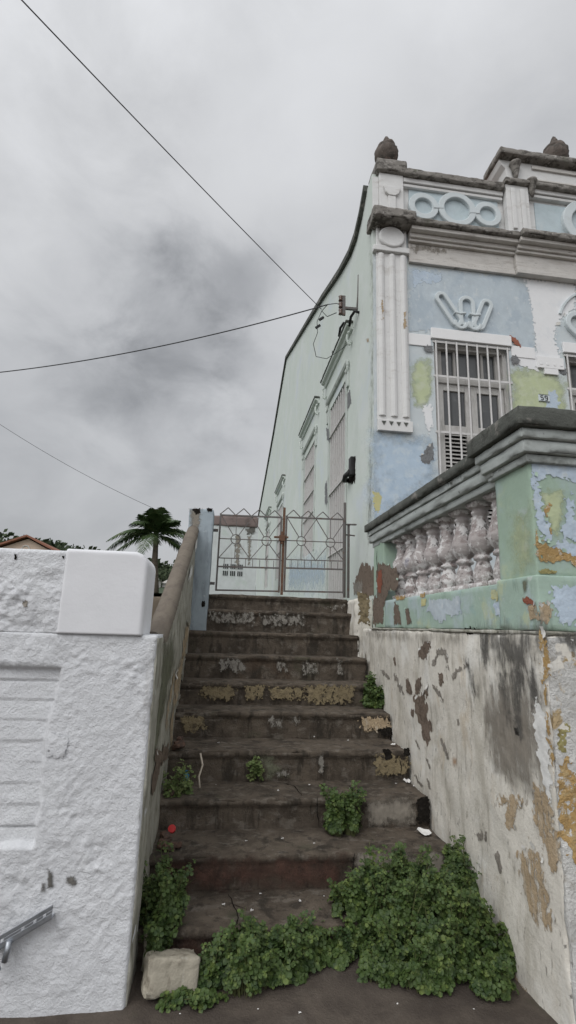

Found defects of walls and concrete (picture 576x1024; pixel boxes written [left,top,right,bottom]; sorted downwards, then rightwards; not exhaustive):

peeling [370,265,576,518]
peeling [353,562,462,627]
peeling [152,620,207,794]
peeling [198,684,356,705]
spalling [357,641,468,824]
damp [482,620,547,786]
peeling [497,464,576,1022]